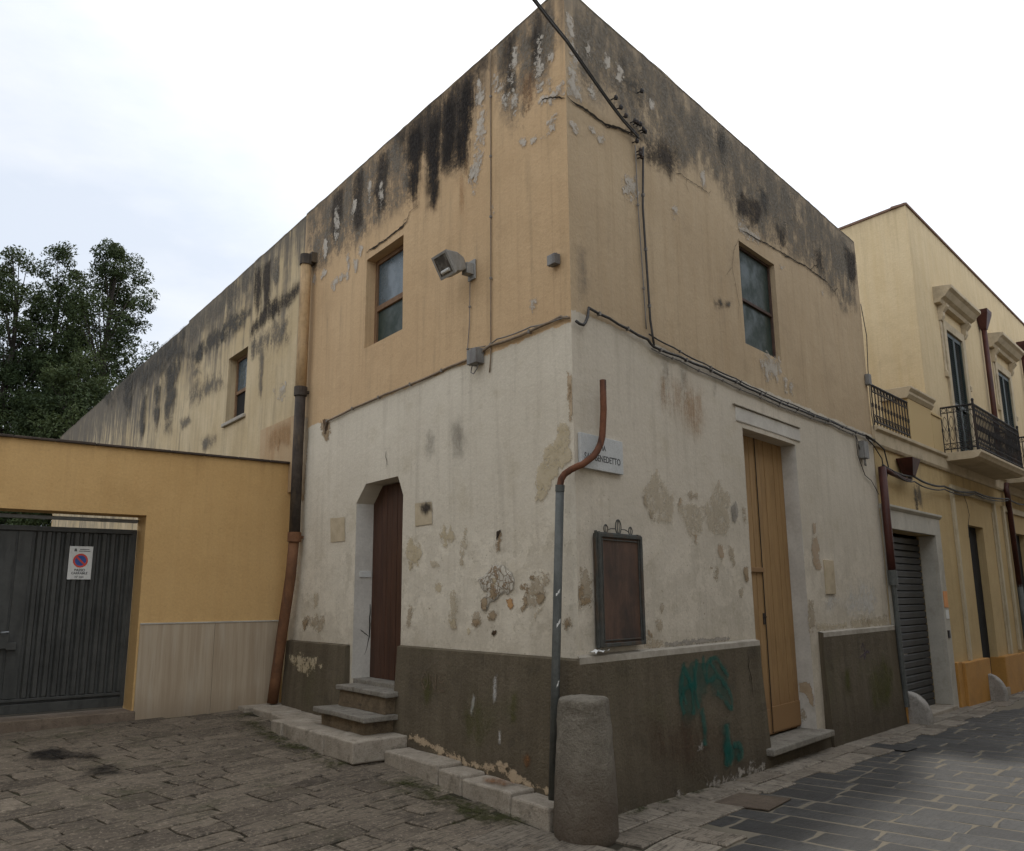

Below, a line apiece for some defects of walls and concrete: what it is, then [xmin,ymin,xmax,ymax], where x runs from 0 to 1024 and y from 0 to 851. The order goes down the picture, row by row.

water stain [308,56,486,267]
peeling [468,46,518,195]
water stain [574,10,856,309]
water stain [105,260,299,439]
peeling [535,371,572,502]
peeling [289,652,322,677]
peeling [435,565,550,637]
peeling [710,544,749,598]
spalling [408,733,549,795]